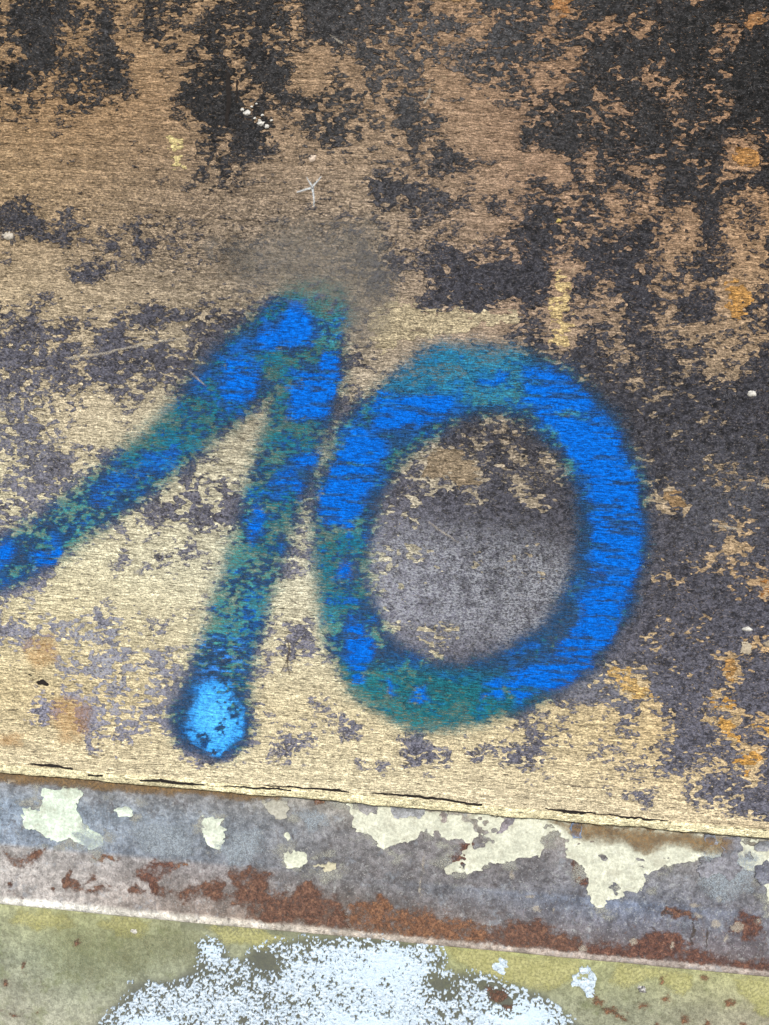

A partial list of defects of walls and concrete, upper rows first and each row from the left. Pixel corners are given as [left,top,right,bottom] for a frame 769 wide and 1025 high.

corrosion [5,848,45,868]
peeling [20,784,112,862]
corrosion [51,870,110,893]
peeling [114,800,142,821]
peeling [194,814,227,853]
peeling [257,795,342,885]
peeling [333,802,769,922]
corrosion [128,859,769,980]
efflorescence [98,933,576,1025]
efflorescence [571,965,597,998]
corrosion [593,995,626,1021]